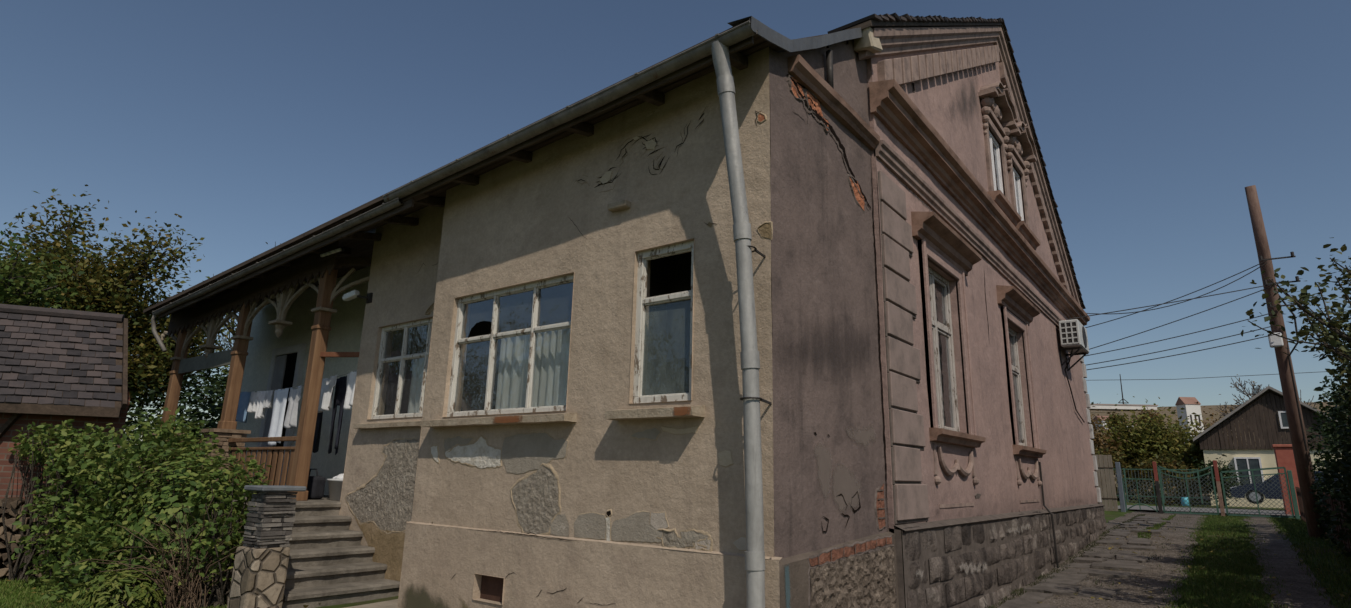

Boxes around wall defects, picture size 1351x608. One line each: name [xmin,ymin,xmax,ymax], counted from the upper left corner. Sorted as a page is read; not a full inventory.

crack [786,74,889,530]
peeling [345,435,502,581]
peeling [510,463,562,535]
flaking render [656,528,713,554]